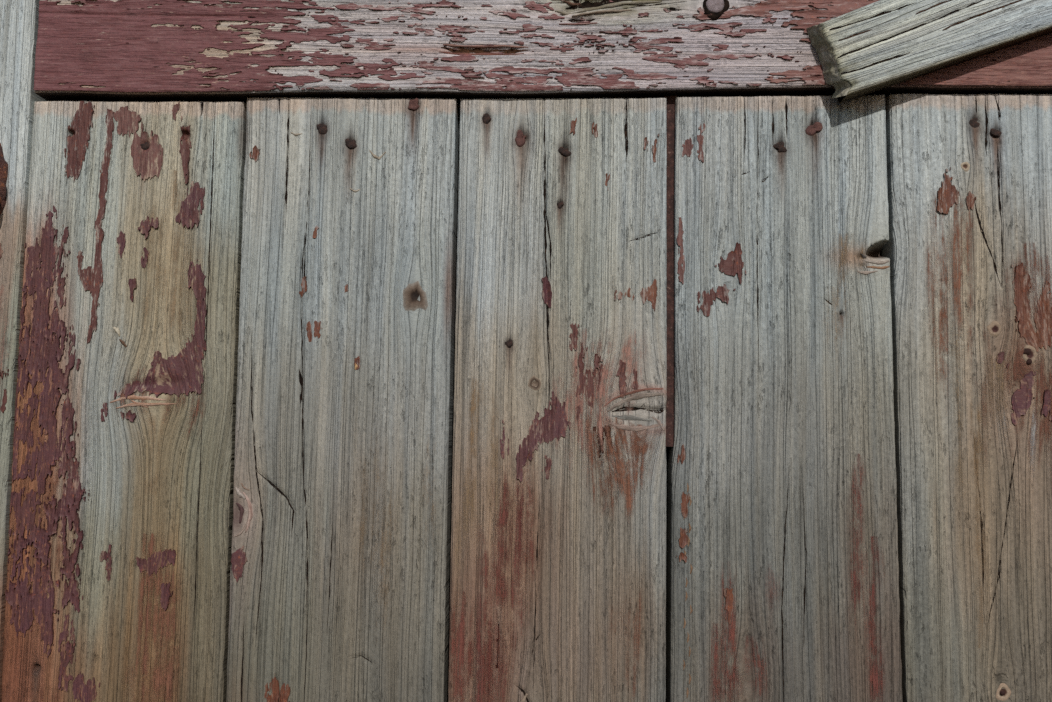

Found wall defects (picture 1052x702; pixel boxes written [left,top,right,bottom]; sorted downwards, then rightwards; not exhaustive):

crack [279,97,311,278]
peeling [34,0,879,229]
peeling [896,33,1052,86]
peeling [0,106,163,702]
peeling [101,259,207,422]
peeling [542,276,552,308]
peeling [500,323,603,481]
peeling [616,359,639,398]
peeling [614,279,657,312]
peeling [697,242,746,317]
peeling [1011,262,1052,352]
crack [241,320,333,702]